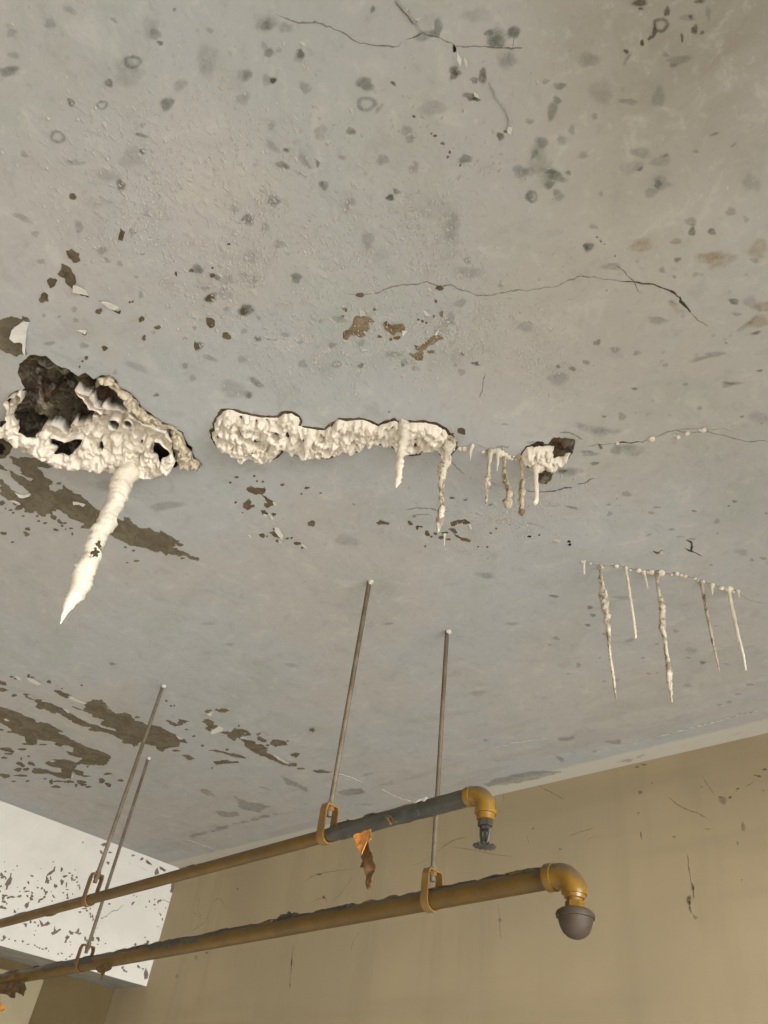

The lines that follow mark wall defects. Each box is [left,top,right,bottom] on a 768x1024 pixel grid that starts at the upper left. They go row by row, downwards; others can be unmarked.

crack [280,16,523,49]
peeling [39,249,134,314]
peeling [206,317,231,340]
crack [351,267,707,326]
spalling [0,316,202,543]
damp [0,380,176,624]
damp [209,408,594,532]
peeling [109,517,199,563]
peeling [0,861,148,980]